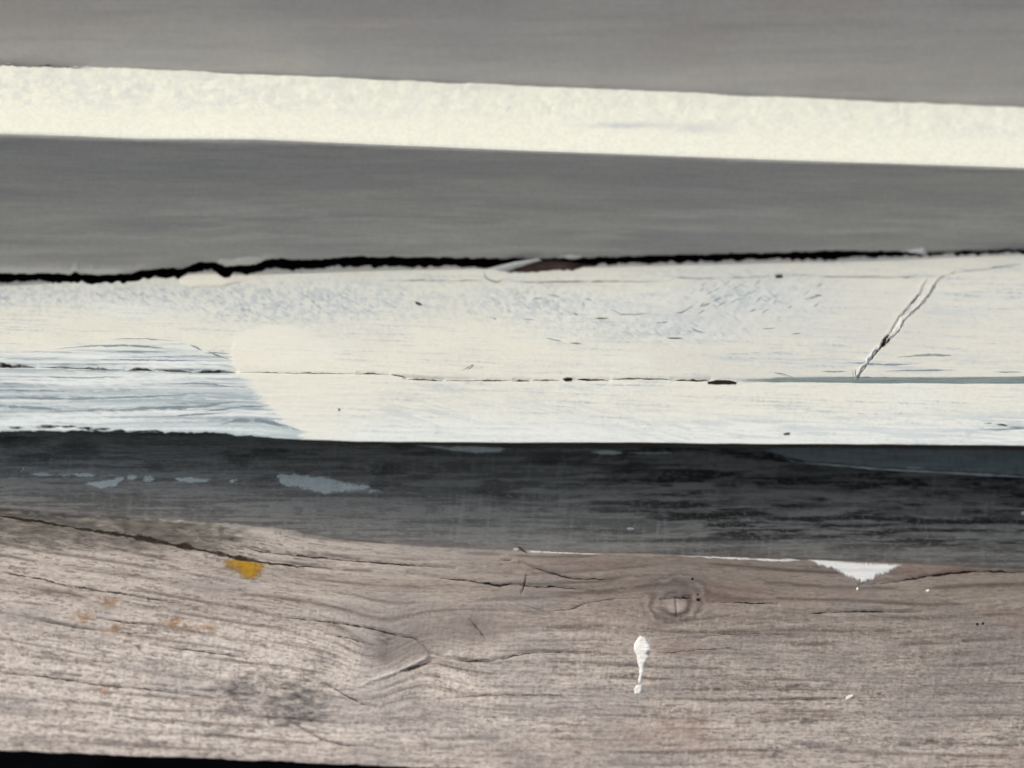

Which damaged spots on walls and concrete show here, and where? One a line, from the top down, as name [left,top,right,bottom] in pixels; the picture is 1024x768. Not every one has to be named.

crack [0,256,522,288]
crack [549,248,1024,378]
peeling [84,338,189,361]
crack [0,363,234,373]
crack [261,372,707,382]
peeling [0,376,298,432]